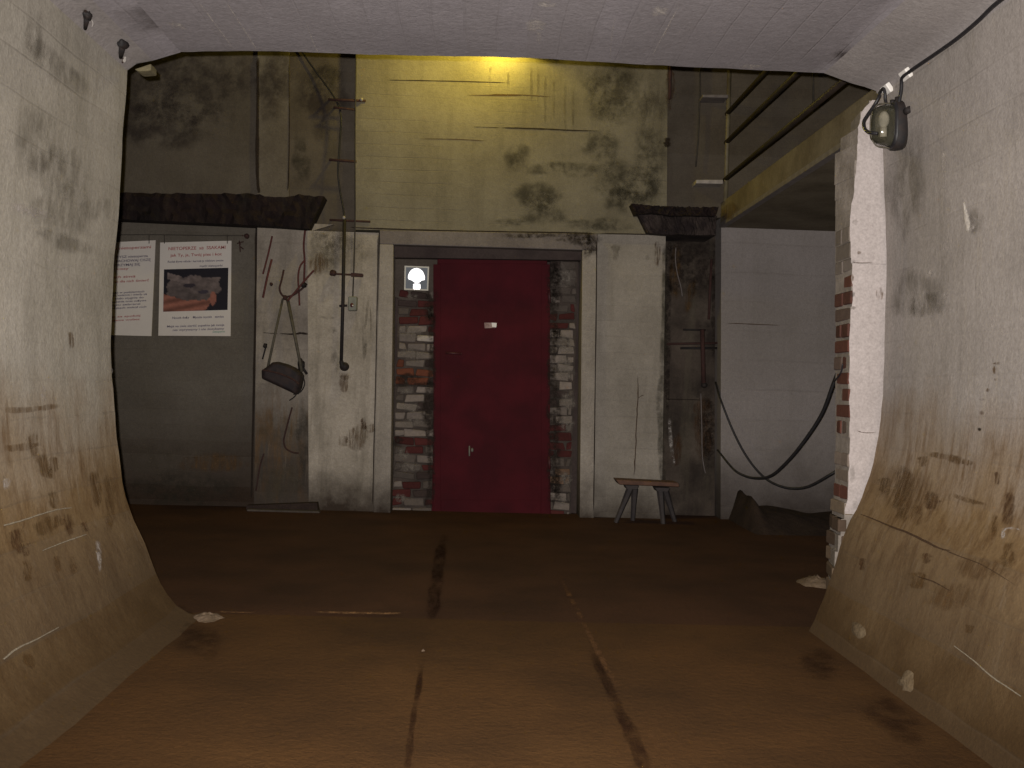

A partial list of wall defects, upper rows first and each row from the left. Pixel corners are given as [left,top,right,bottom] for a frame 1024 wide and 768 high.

flaking render [834,226,854,434]
flaking render [826,451,852,589]
crack [861,514,1007,580]